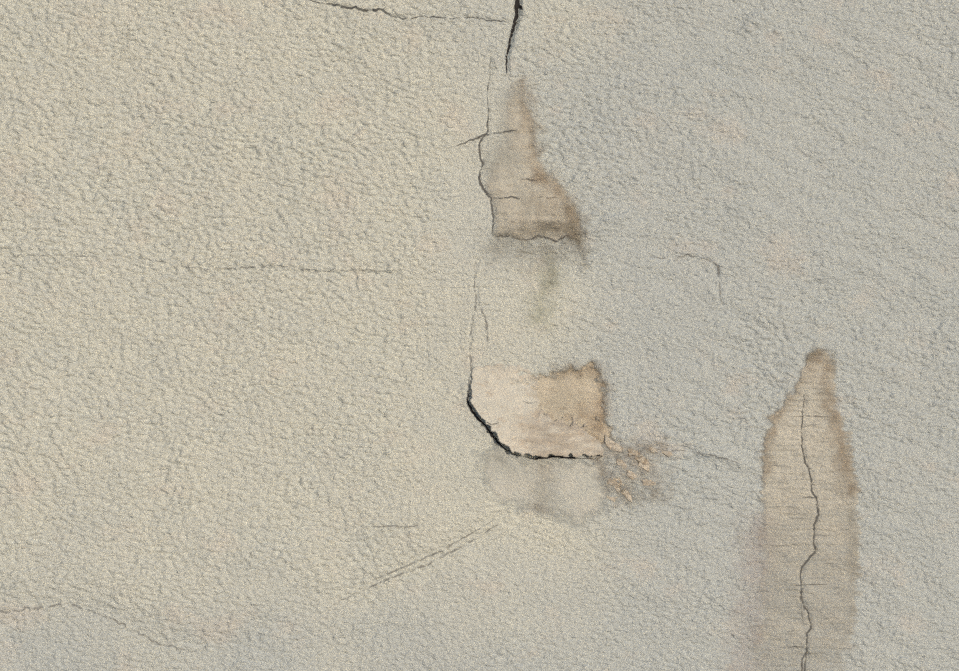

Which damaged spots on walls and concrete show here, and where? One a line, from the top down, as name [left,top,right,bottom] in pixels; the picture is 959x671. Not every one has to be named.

crack [310,0,523,233]
crack [466,261,489,400]
peeling [467,362,612,527]
crack [800,398,820,671]